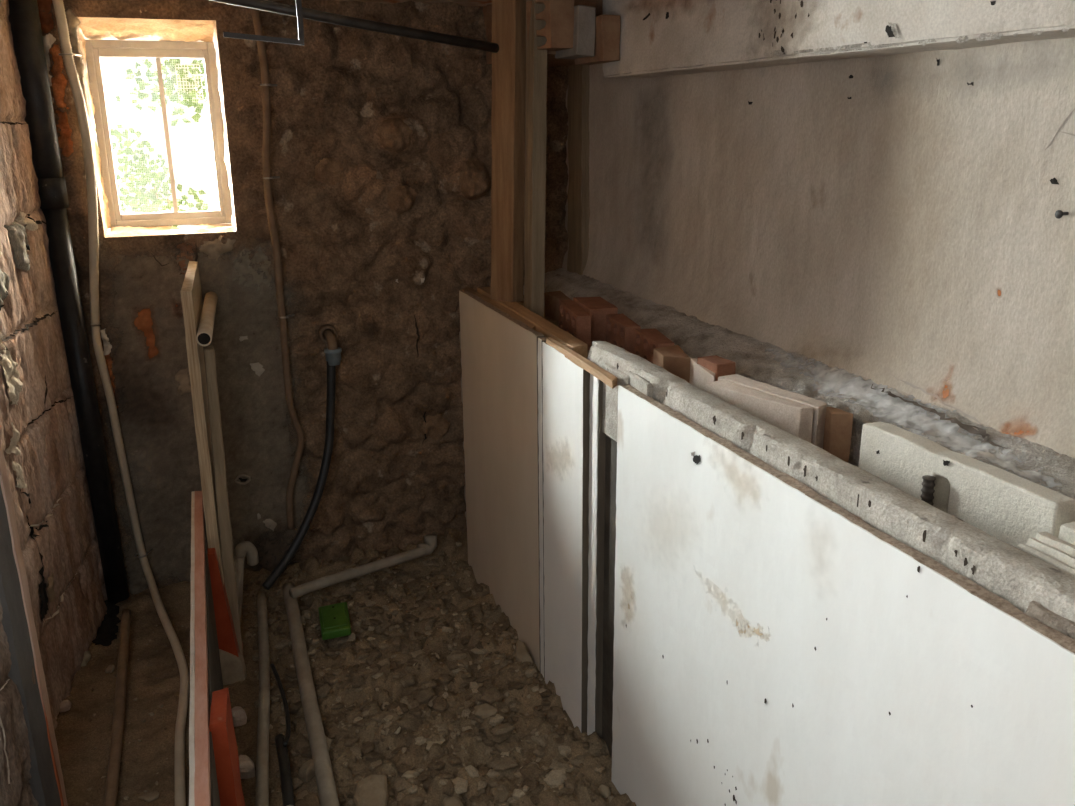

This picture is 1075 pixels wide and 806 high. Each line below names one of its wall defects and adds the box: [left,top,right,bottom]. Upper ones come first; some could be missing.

crack [24,376,74,429]
crack [20,489,77,621]